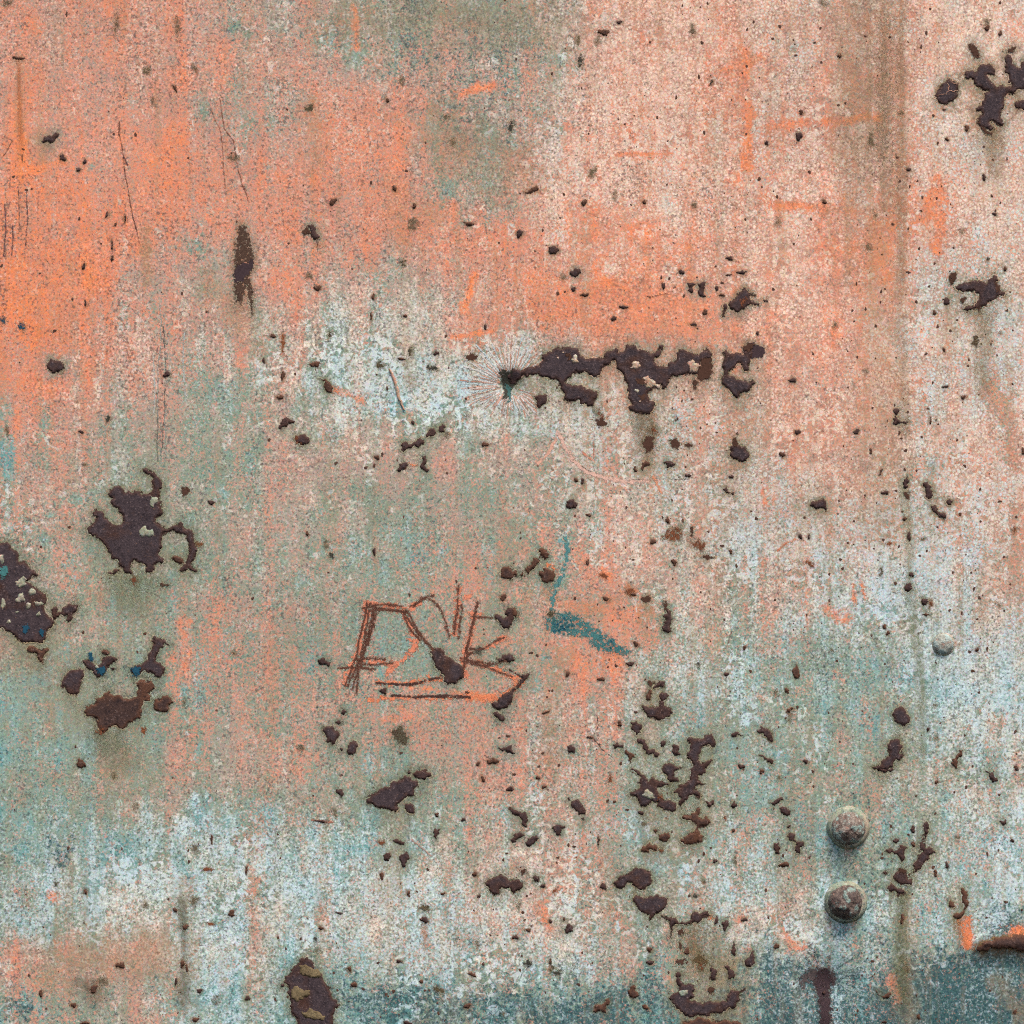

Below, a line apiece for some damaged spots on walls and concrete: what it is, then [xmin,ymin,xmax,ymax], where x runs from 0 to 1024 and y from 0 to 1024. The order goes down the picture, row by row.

corrosion [233,220,258,315]
corrosion [428,247,854,1024]
corrosion [851,807,1024,954]
corrosion [793,952,940,1024]